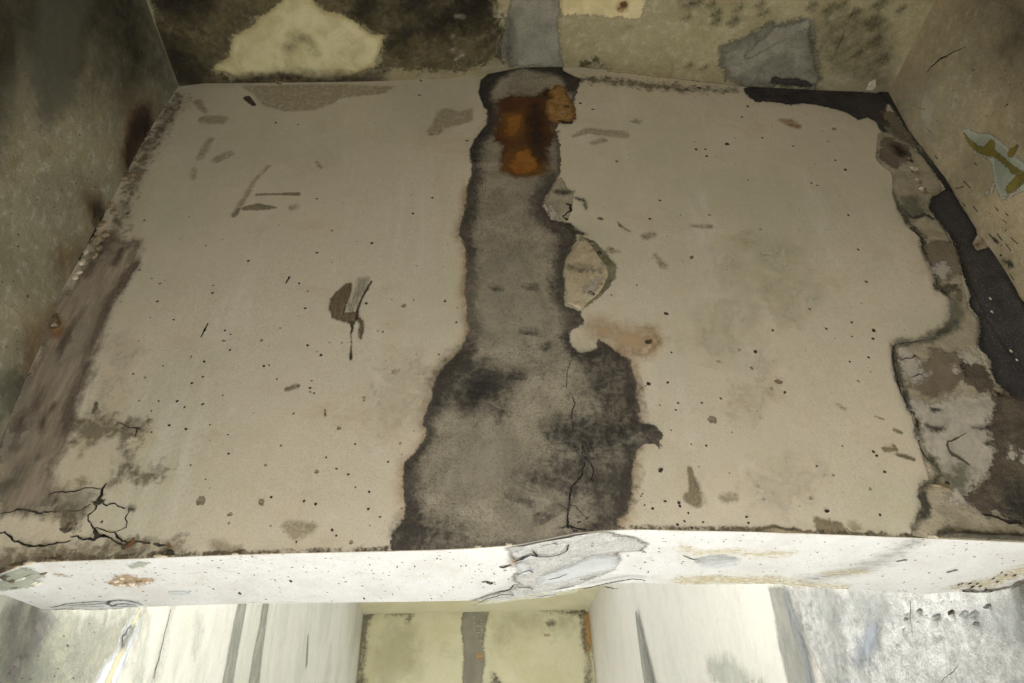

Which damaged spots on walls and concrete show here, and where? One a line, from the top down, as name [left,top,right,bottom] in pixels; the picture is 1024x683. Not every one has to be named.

peeling [213,0,384,85]
corrosion [494,88,559,177]
leakage [0,0,580,551]
flaking render [545,178,616,310]
leakage [518,171,658,529]
leakage [744,76,1024,526]
flaking render [876,110,1024,542]
crack [0,483,174,559]
crack [512,363,595,563]